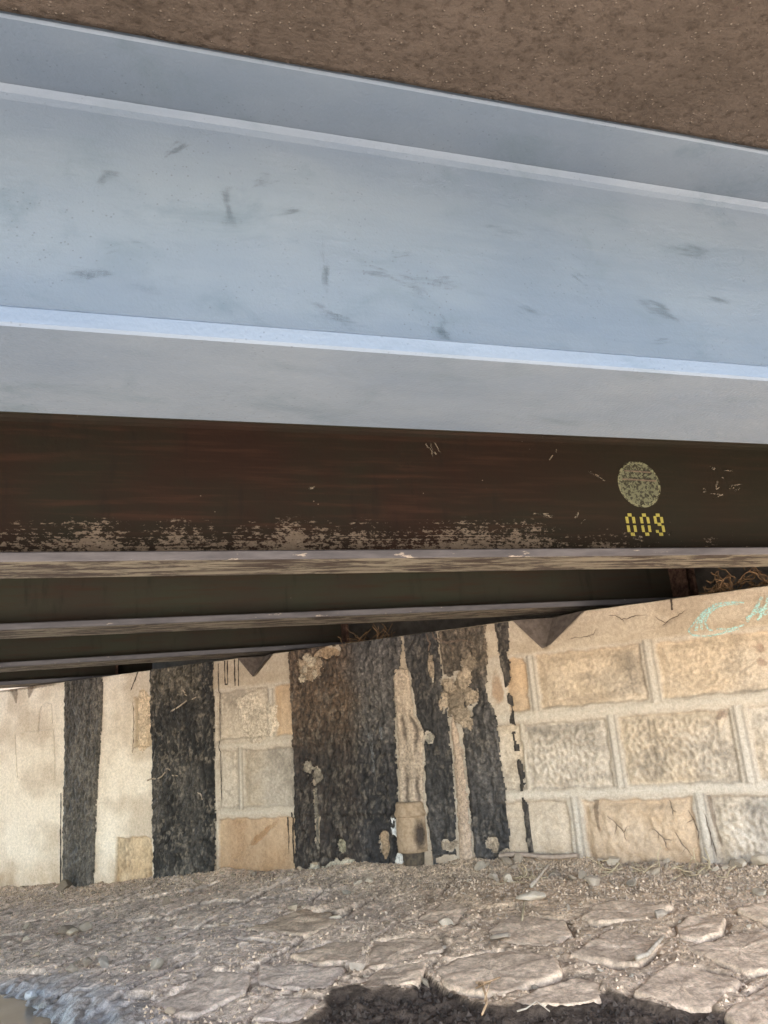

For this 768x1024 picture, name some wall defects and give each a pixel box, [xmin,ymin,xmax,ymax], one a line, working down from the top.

crack [653,800,717,856]